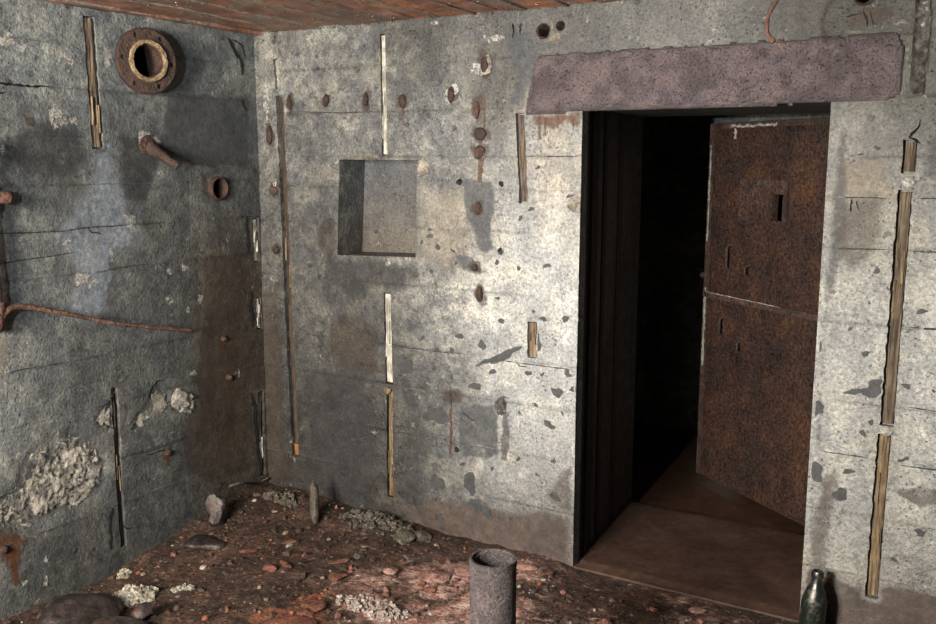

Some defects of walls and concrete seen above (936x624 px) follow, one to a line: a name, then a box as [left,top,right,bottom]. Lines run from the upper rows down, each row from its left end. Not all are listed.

crack [0,82,50,94]
efflorescence [49,107,78,129]
corrosion [535,114,580,139]
corrosion [471,97,490,182]
water stain [808,572,936,624]